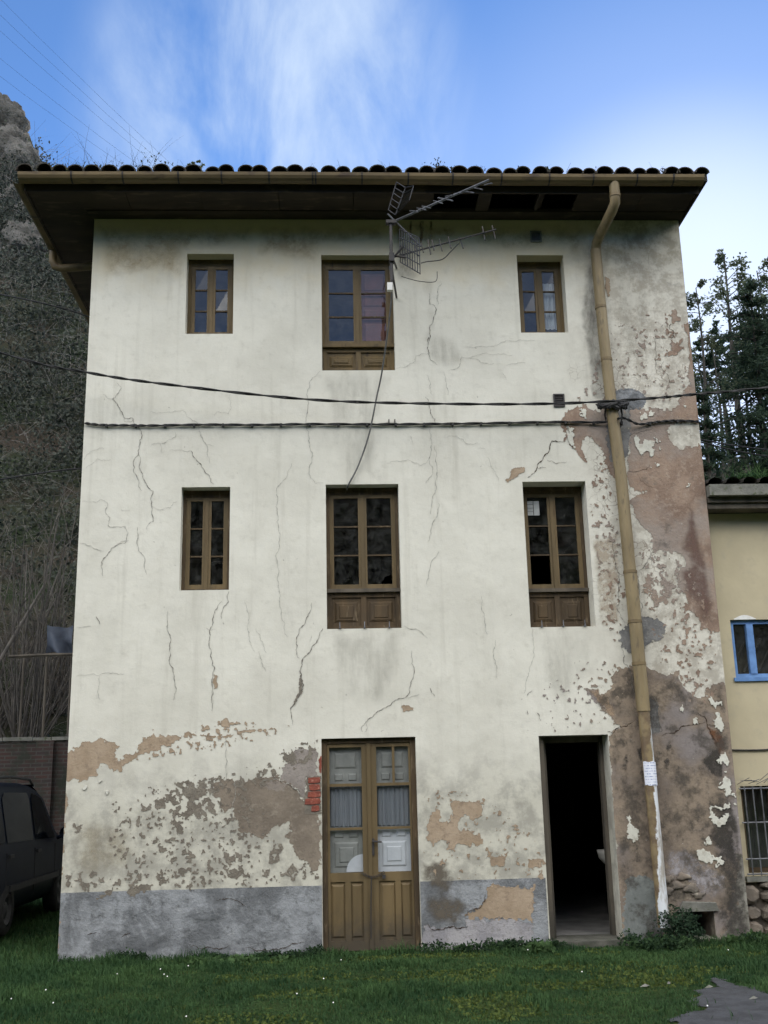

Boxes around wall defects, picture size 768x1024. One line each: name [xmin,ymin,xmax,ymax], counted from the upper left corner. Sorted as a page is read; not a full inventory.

crack [83,386,231,576]
crack [207,372,323,721]
crack [361,626,435,732]
crack [391,283,529,584]
spalling [543,309,743,941]
spalling [62,718,323,900]
spalling [421,790,546,951]